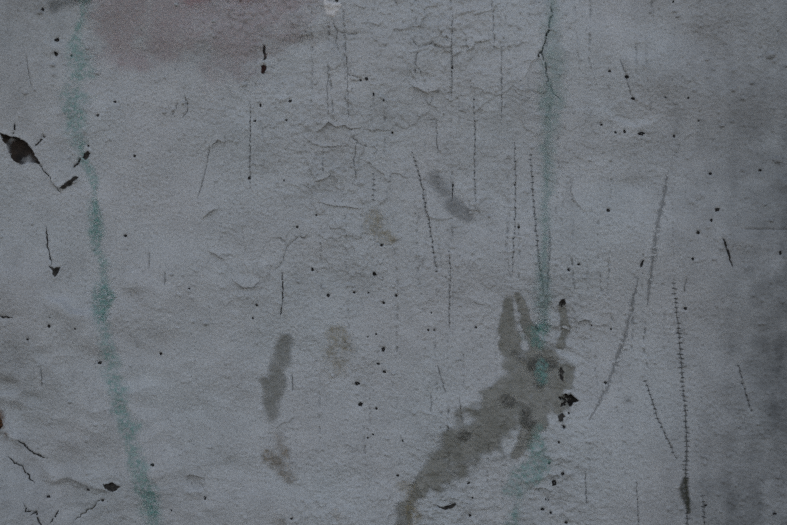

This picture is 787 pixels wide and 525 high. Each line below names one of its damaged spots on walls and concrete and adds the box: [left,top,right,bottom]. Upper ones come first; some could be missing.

spalling [0,129,40,165]
leakage [261,335,291,418]
leakage [396,293,574,525]
spalling [558,368,579,422]